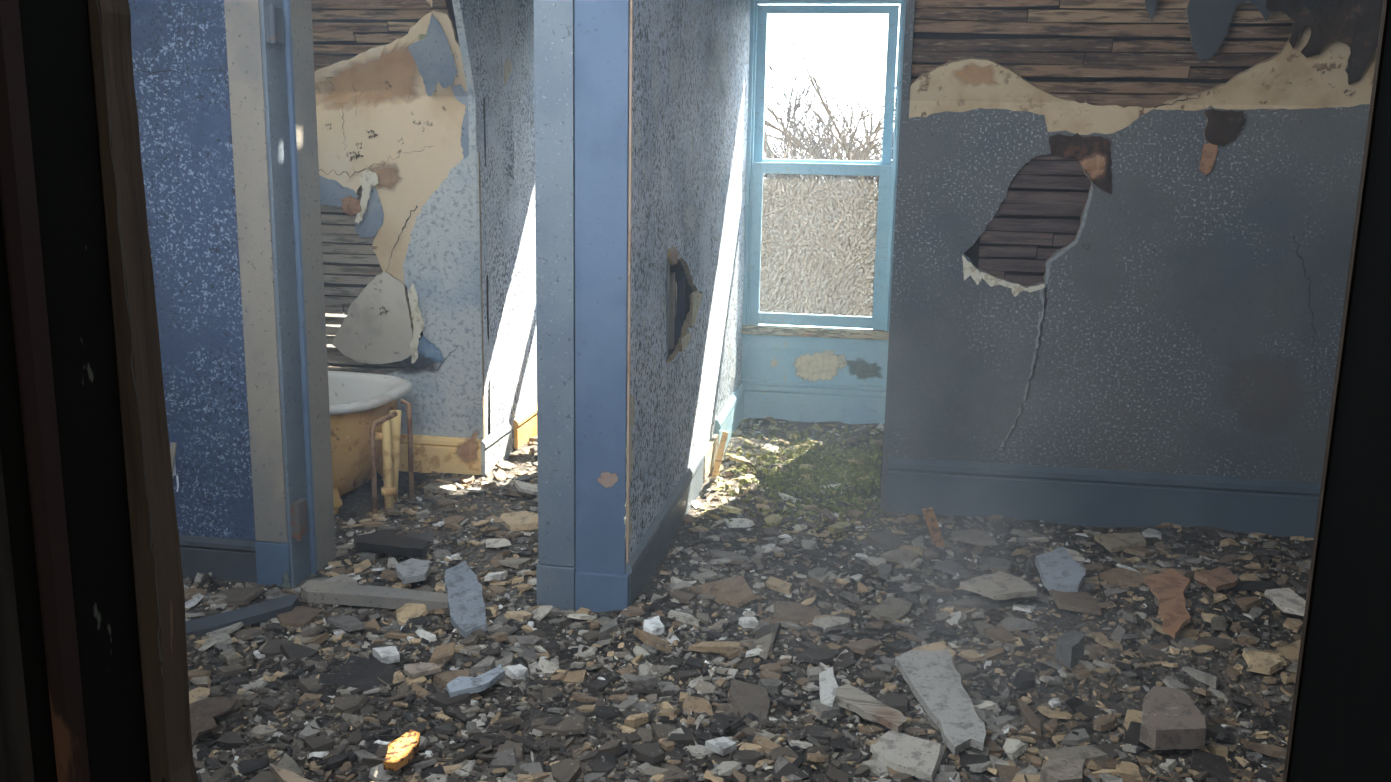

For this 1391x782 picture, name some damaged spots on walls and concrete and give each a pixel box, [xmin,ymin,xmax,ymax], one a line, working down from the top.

flaking render [909,0,1377,135]
peeling [311,0,469,375]
flaking render [962,153,1094,297]
hole [665,247,703,359]
peeling [770,350,847,382]
crack [984,287,1048,453]